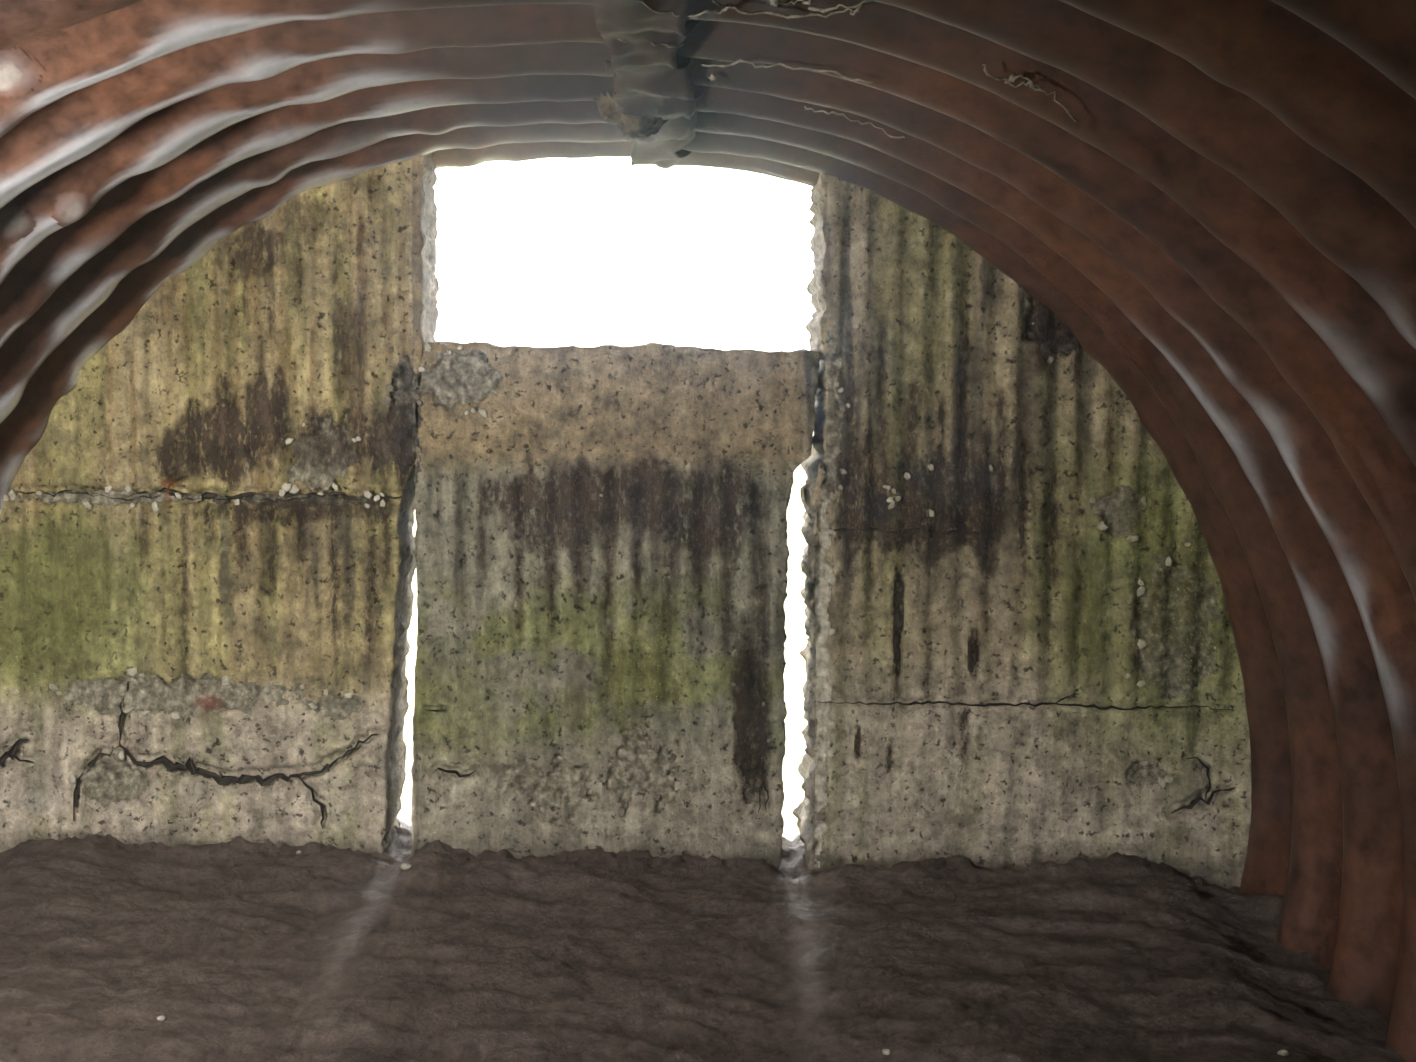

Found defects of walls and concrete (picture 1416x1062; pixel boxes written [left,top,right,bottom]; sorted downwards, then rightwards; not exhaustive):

water stain [157,368,412,650]
water stain [832,321,1027,675]
water stain [479,453,769,792]
crack [0,738,34,766]
crack [73,682,378,829]
water stain [960,708,968,754]
crack [1171,757,1235,814]